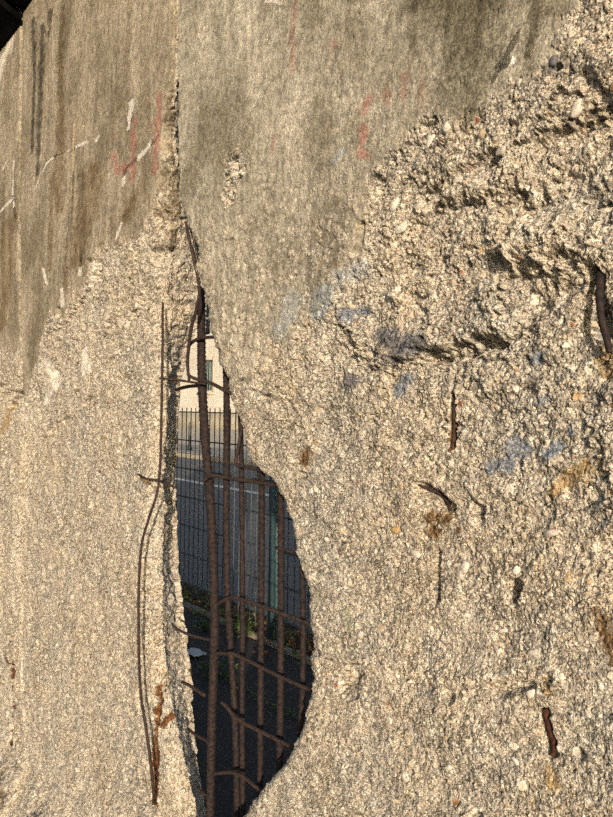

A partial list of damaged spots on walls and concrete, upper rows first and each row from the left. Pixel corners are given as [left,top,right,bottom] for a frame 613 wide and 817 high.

spalling [0,151,214,817]
rust [145,684,176,806]
spalling [165,101,177,135]
spalling [215,0,613,817]